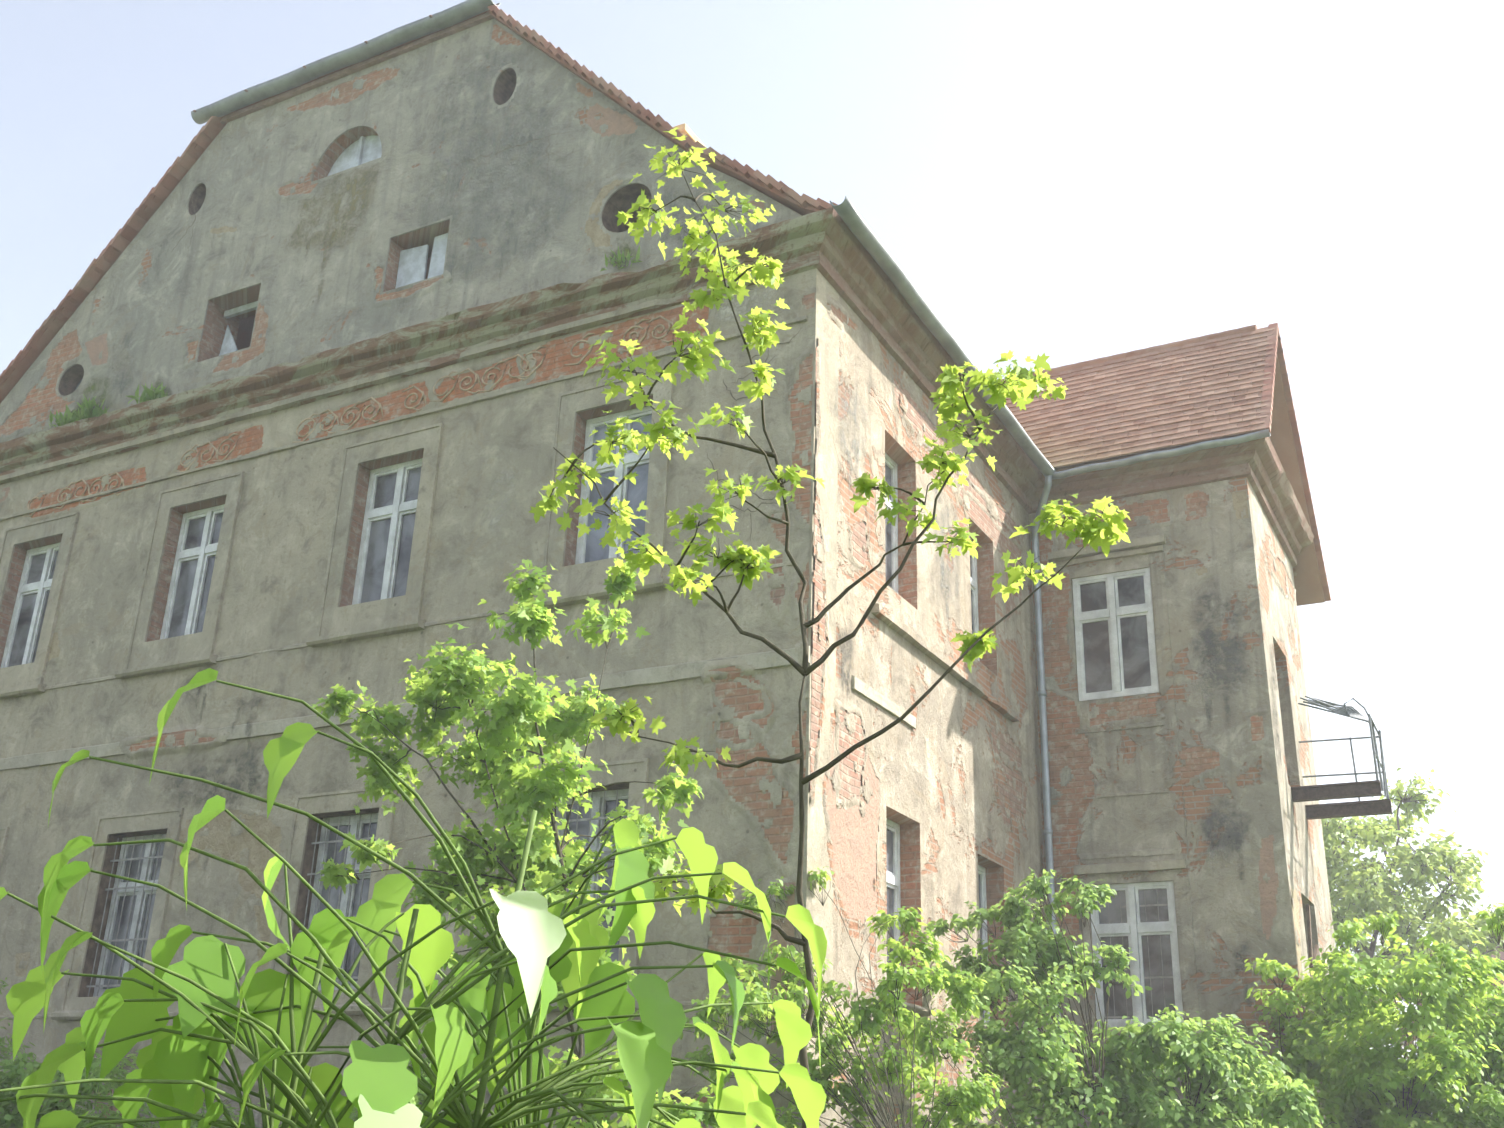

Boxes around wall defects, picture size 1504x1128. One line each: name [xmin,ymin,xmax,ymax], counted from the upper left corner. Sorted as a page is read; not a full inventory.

spalling [794,286,862,340]
spalling [0,321,85,442]
spalling [119,722,230,761]
spalling [700,342,882,1064]
spalling [891,372,1249,949]
spalling [226,1061,268,1092]